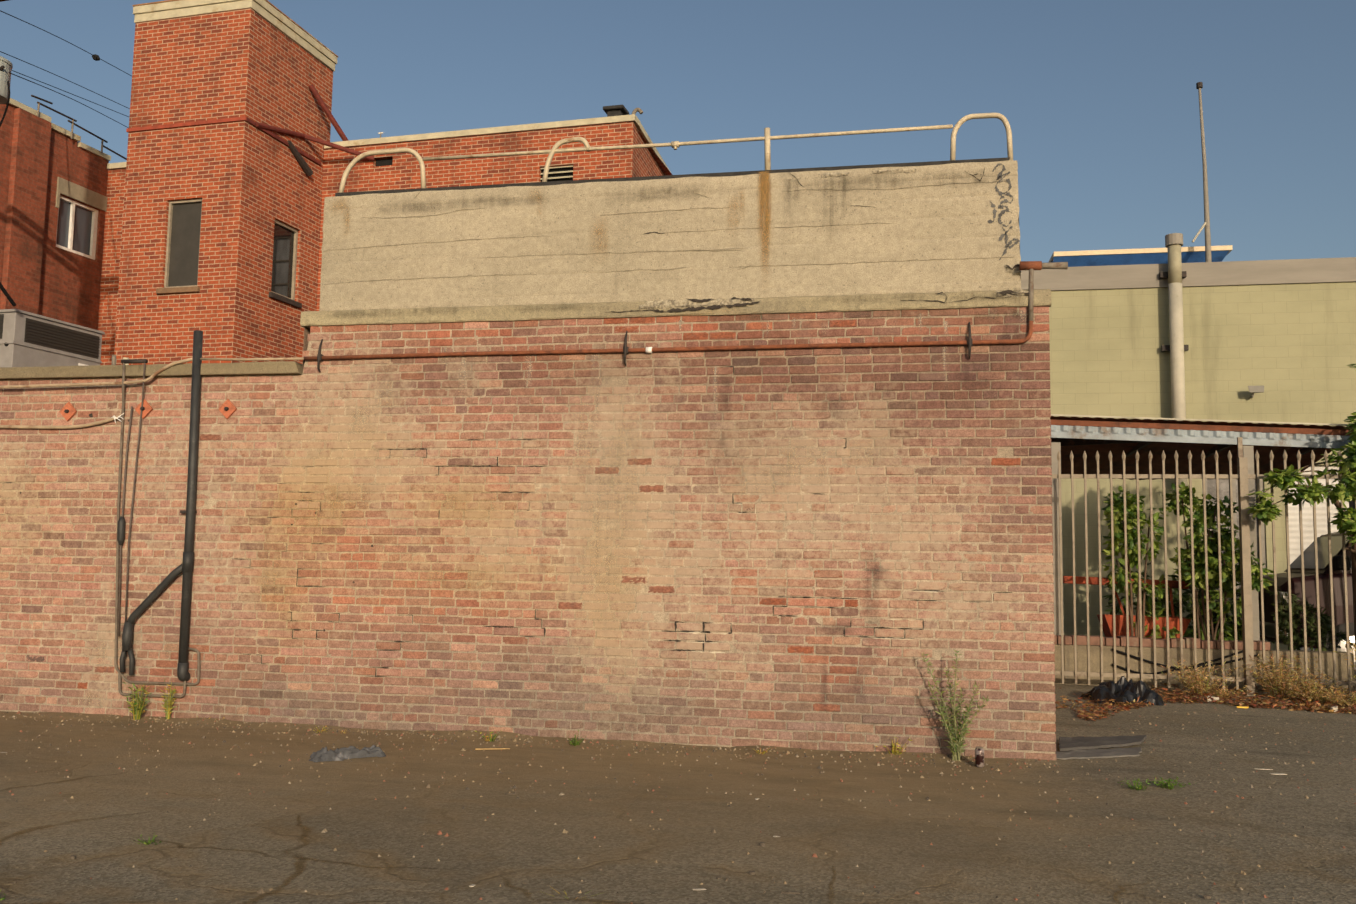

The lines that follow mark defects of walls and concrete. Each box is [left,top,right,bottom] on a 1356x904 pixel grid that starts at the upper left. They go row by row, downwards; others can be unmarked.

crack [324,168,1004,285]
spalling [603,297,760,333]
spalling [683,332,736,340]